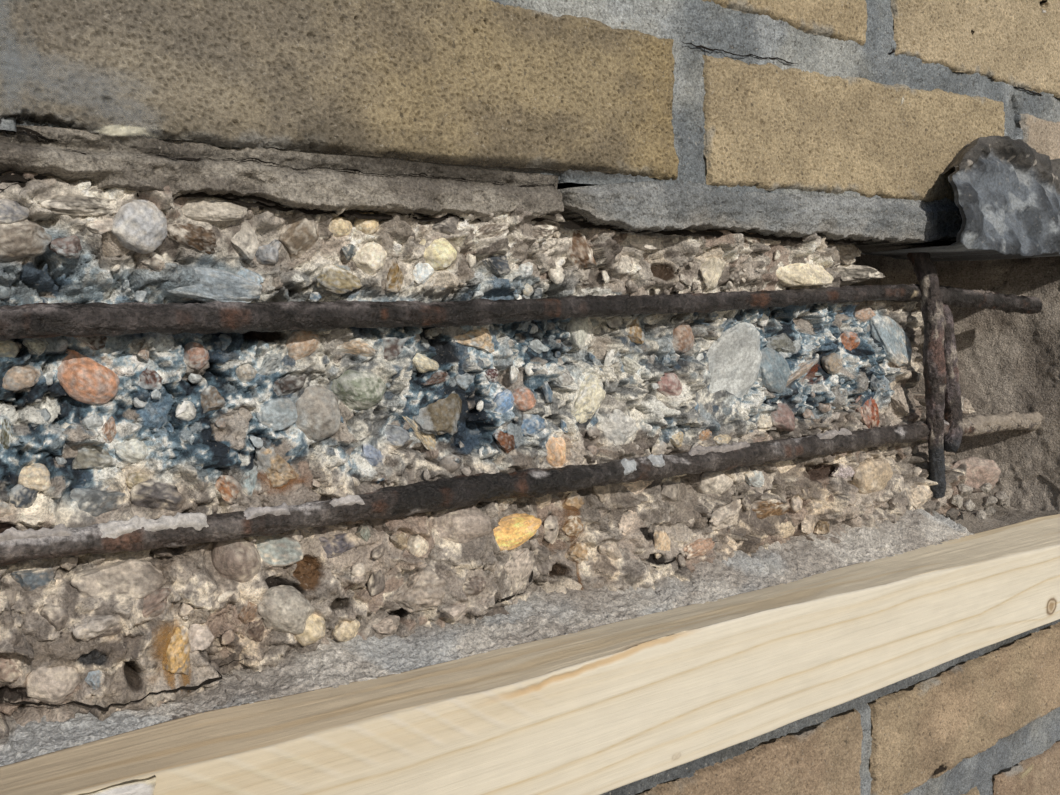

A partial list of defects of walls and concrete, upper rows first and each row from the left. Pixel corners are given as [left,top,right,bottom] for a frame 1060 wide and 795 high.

crack [681,41,797,64]
crack [5,126,86,154]
crack [0,172,49,191]
crack [136,152,555,187]
crack [174,192,481,222]
crack [531,218,865,245]
spalling [939,285,1043,314]
spalling [944,395,1044,437]
spalling [0,171,1001,739]
rust [565,506,580,525]